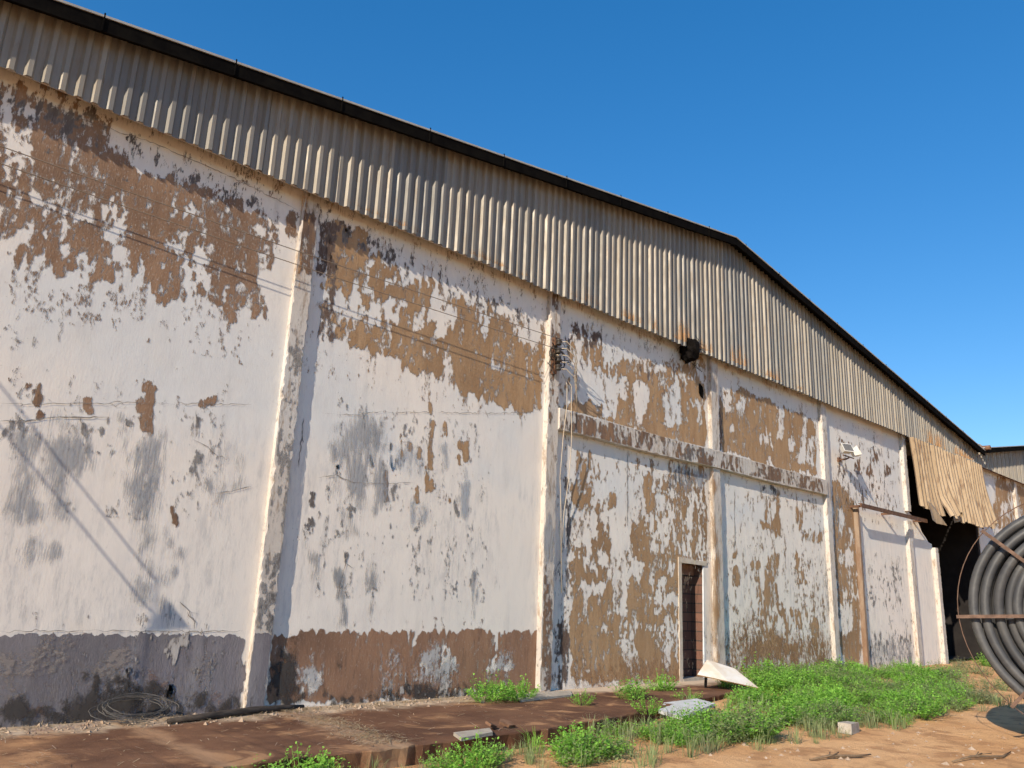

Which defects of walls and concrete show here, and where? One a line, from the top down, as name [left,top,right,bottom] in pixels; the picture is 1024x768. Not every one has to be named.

damp [1,375,240,603]
peeling [0,80,900,705]
damp [0,638,241,728]